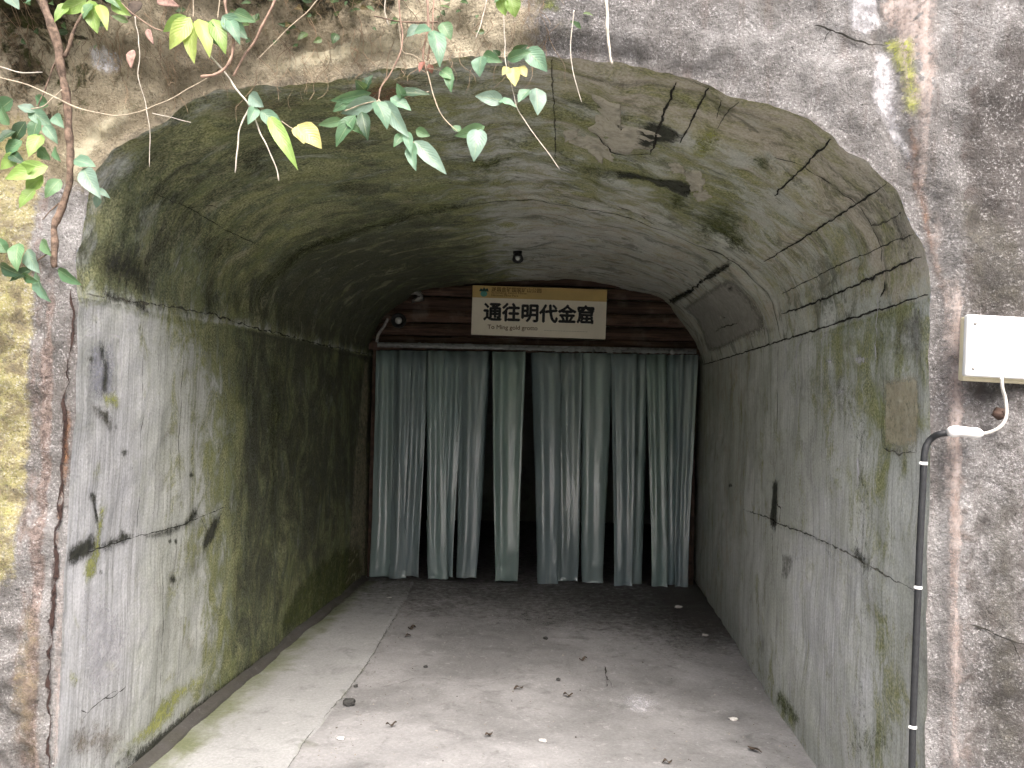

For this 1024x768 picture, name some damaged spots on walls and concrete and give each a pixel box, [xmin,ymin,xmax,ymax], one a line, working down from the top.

crack [815,25,885,46]
peeling [563,94,712,203]
crack [777,158,901,297]
crack [668,264,729,305]
leakage [69,531,133,564]
crack [45,290,226,768]
leakage [154,509,197,544]
leakage [204,516,220,549]
crack [748,479,913,590]